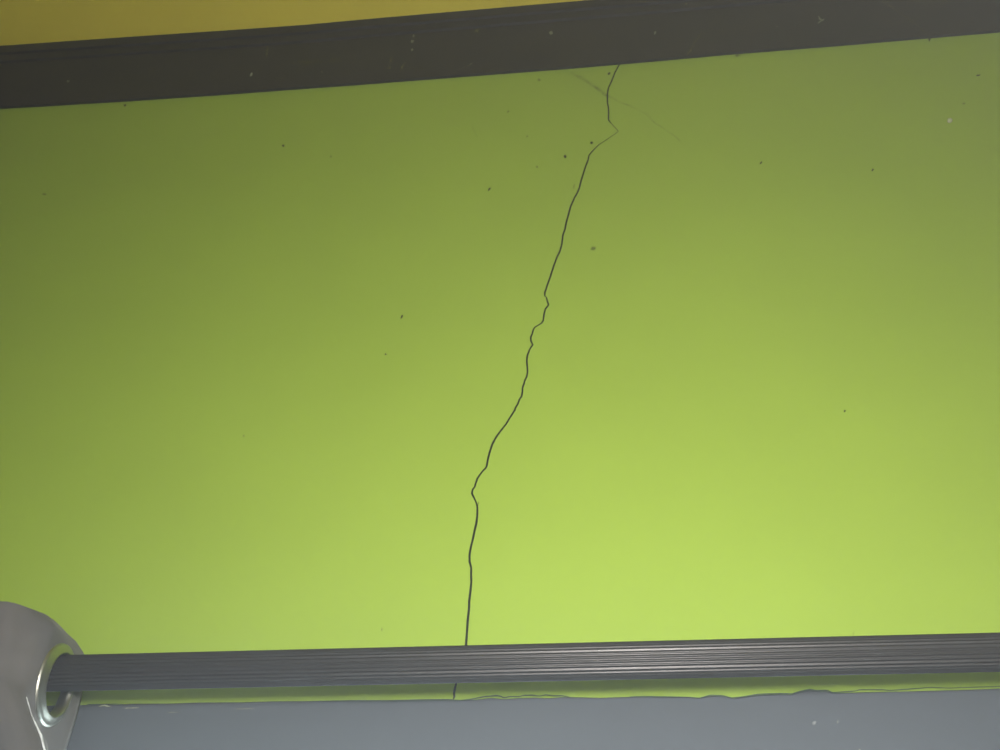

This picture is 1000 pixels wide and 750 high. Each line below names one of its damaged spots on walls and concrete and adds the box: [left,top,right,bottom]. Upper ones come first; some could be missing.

crack [465,64,620,645]